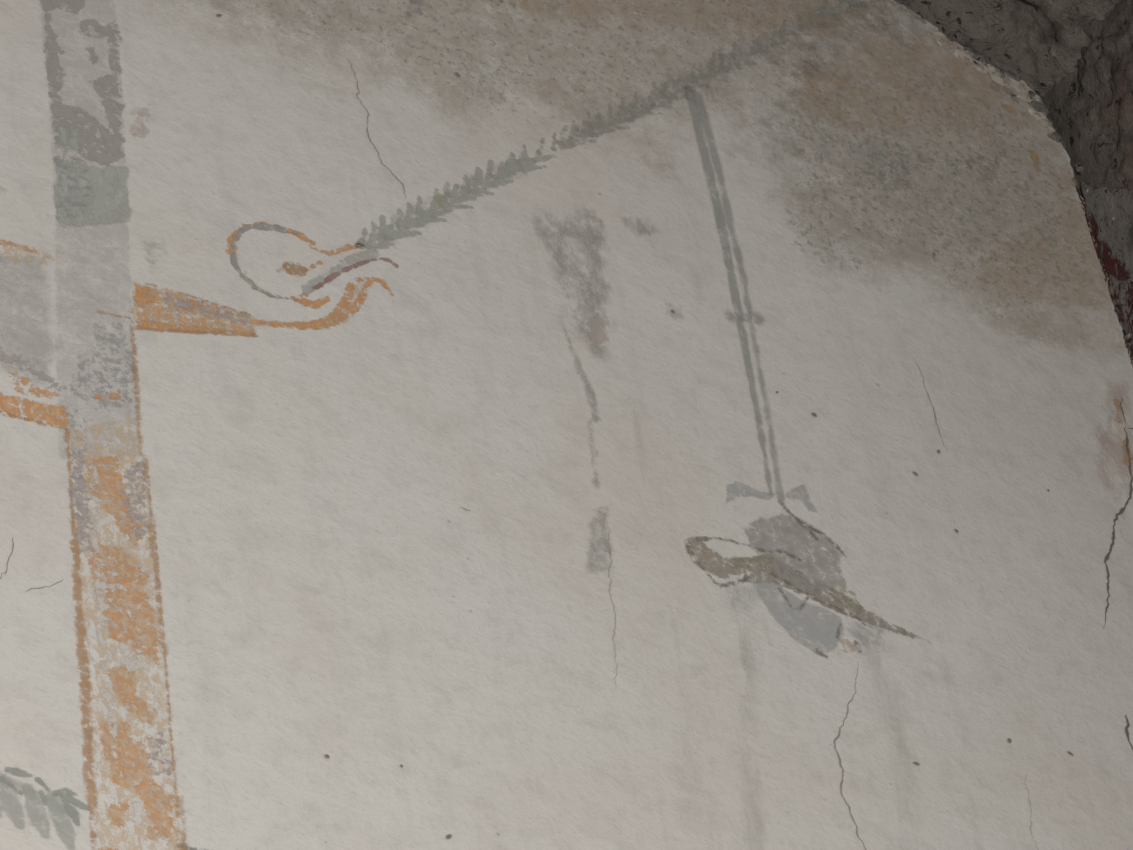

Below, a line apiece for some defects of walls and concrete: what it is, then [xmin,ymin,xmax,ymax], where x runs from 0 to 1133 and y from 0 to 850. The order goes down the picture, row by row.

crack [348,59,406,198]
leakage [253,0,1105,343]
spalling [889,0,1063,143]
crack [1104,398,1133,623]
crack [834,668,867,850]
crack [1125,715,1133,749]